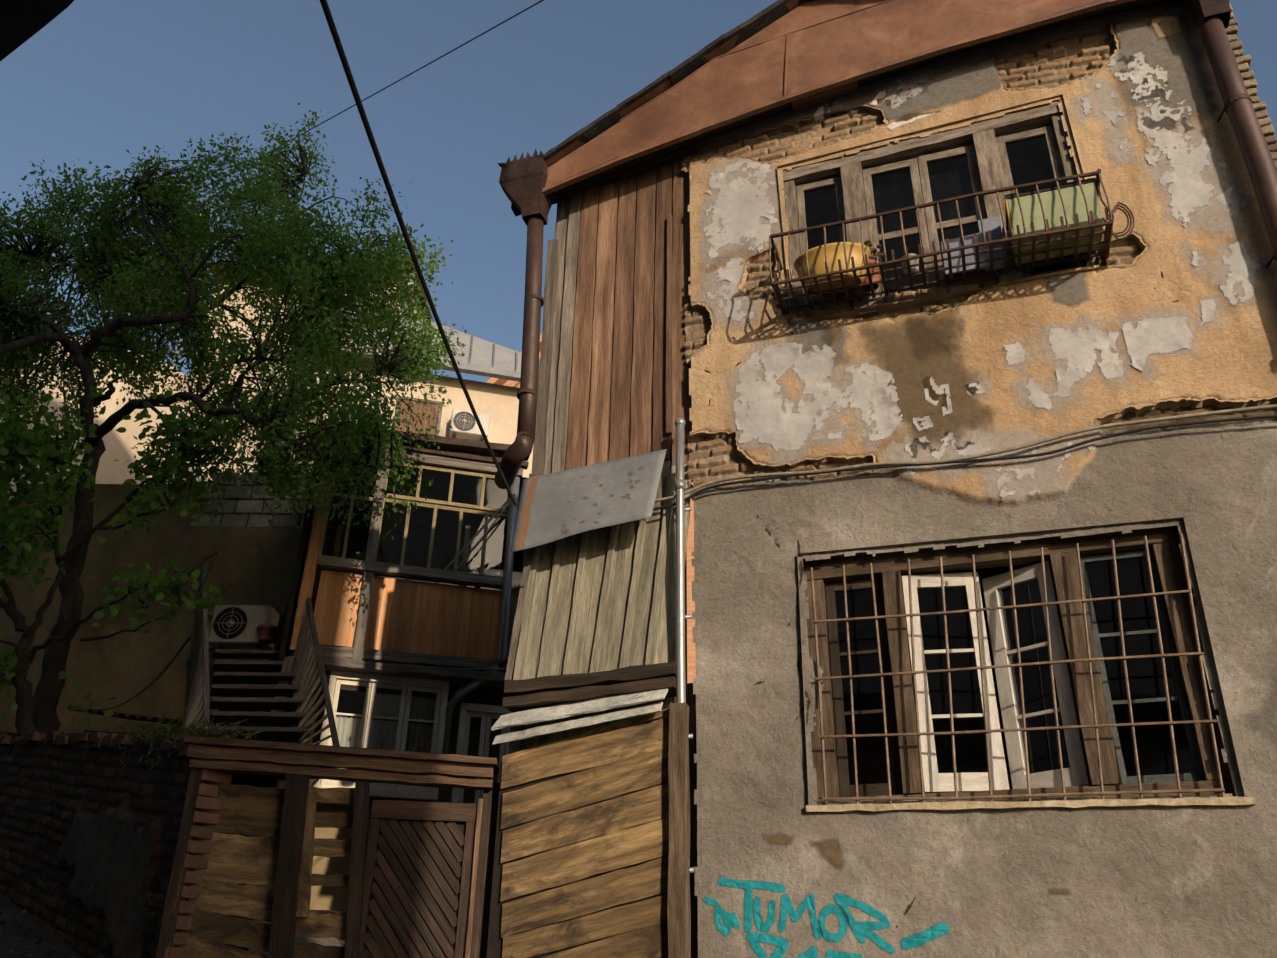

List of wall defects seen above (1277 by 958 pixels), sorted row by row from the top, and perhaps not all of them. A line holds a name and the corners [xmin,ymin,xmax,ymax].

spalling [681,76,1030,365]
peeling [993,22,1248,227]
peeling [687,342,1041,500]
peeling [1024,241,1261,410]